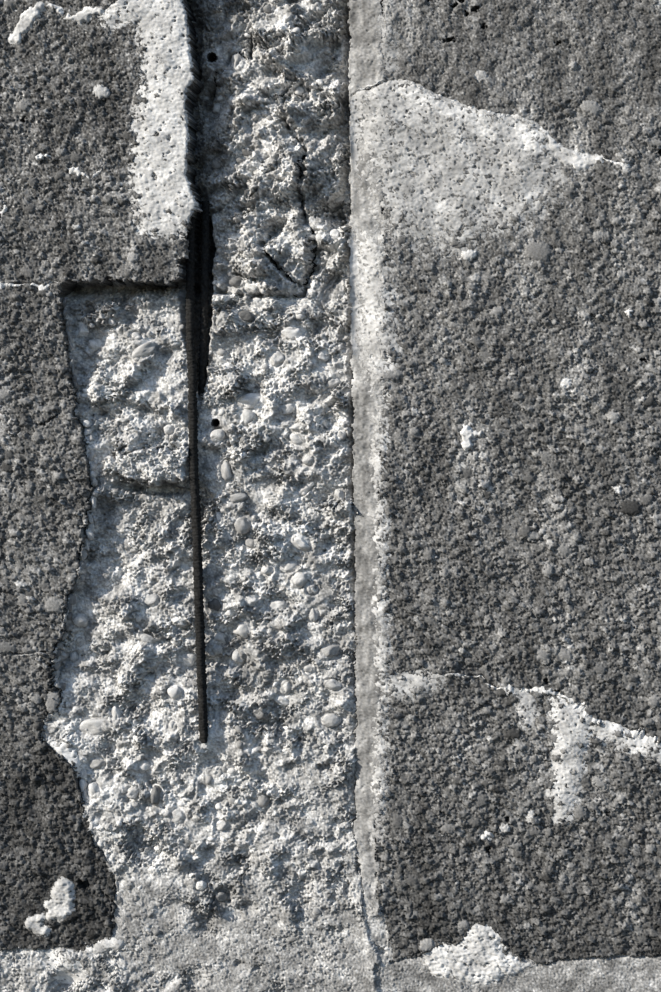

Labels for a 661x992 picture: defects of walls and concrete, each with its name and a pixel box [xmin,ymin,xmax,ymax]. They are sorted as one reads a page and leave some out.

crack [0,281,60,290]
spalling [40,0,368,954]
crack [0,649,47,657]